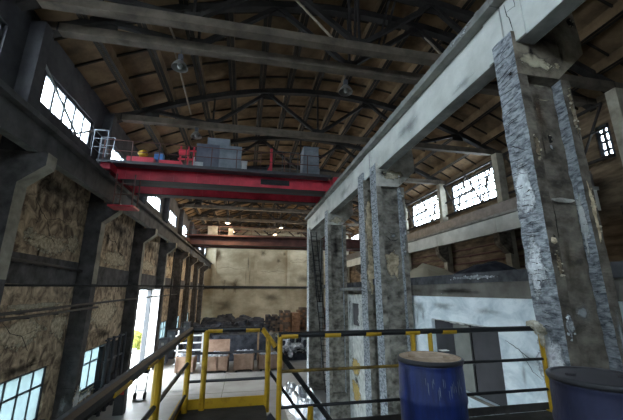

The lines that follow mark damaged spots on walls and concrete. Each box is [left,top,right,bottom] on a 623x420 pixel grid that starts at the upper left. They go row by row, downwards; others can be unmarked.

crack [496,0,551,327]